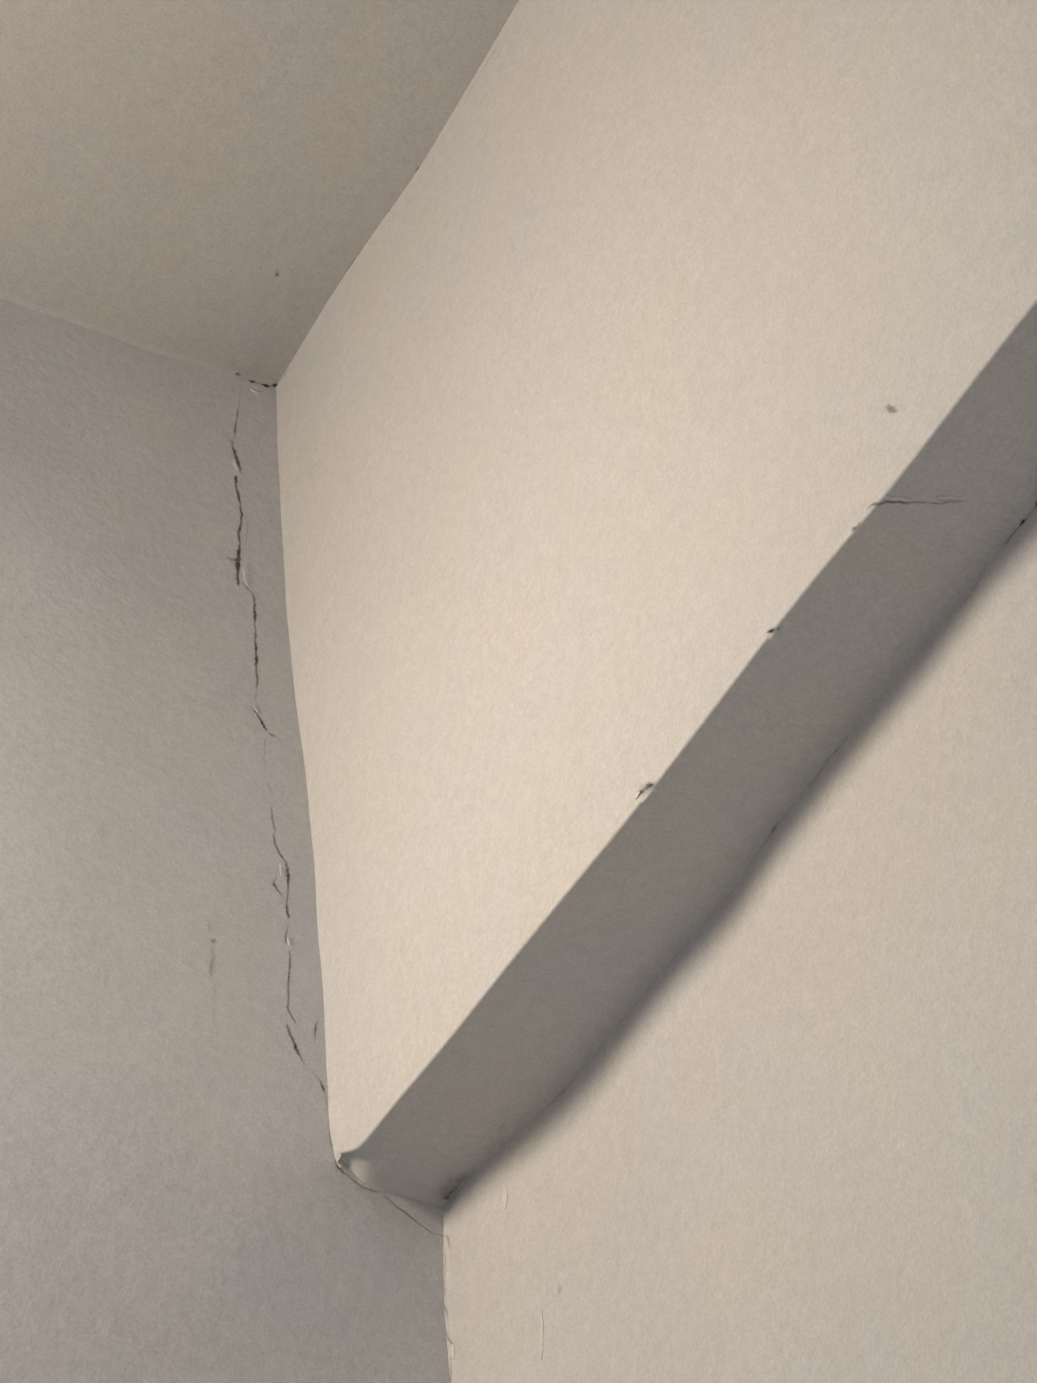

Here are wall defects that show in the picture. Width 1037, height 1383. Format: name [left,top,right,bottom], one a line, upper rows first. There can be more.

crack [233,429,266,729]
crack [273,841,291,979]